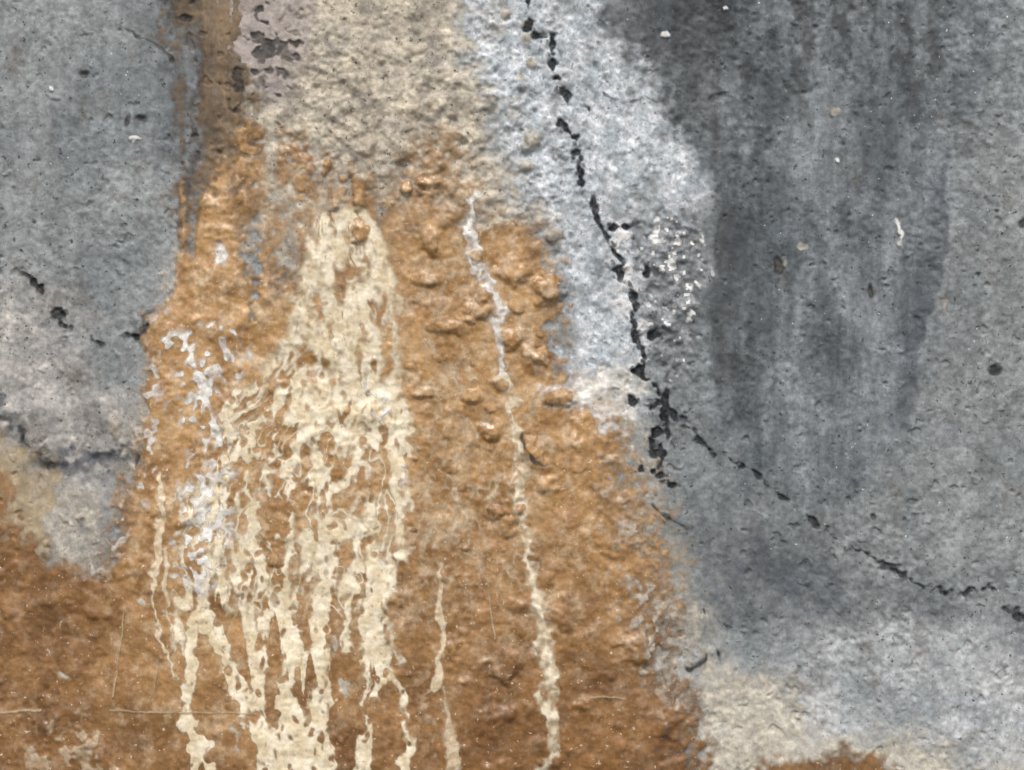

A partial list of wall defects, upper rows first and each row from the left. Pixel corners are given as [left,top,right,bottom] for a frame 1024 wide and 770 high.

damp [0,206,416,770]
corrosion [0,0,713,770]
crack [520,0,715,528]
damp [463,0,952,770]
crack [739,463,788,501]
corrosion [756,742,885,770]
crack [866,553,1024,622]